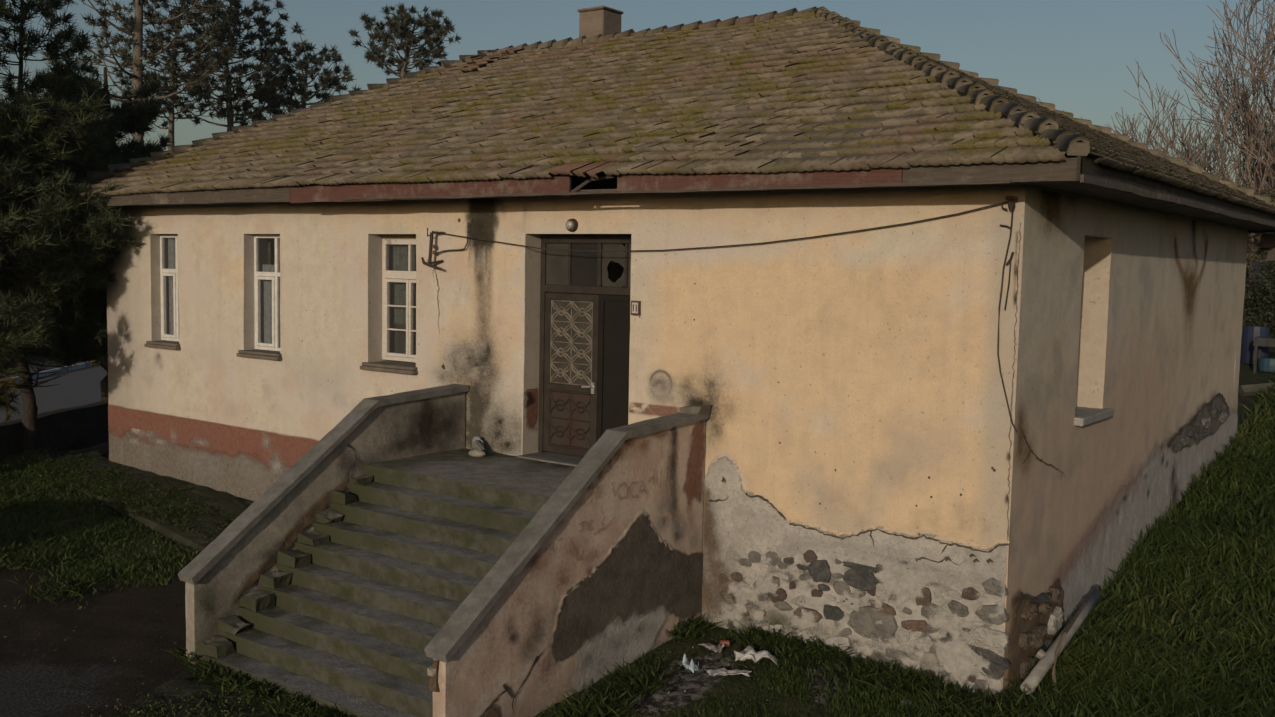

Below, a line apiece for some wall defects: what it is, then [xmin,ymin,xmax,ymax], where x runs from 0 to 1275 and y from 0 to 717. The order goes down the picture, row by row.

leakage [467,198,498,255]
leakage [395,347,517,452]
spalling [552,393,1238,696]
crack [480,647,546,717]